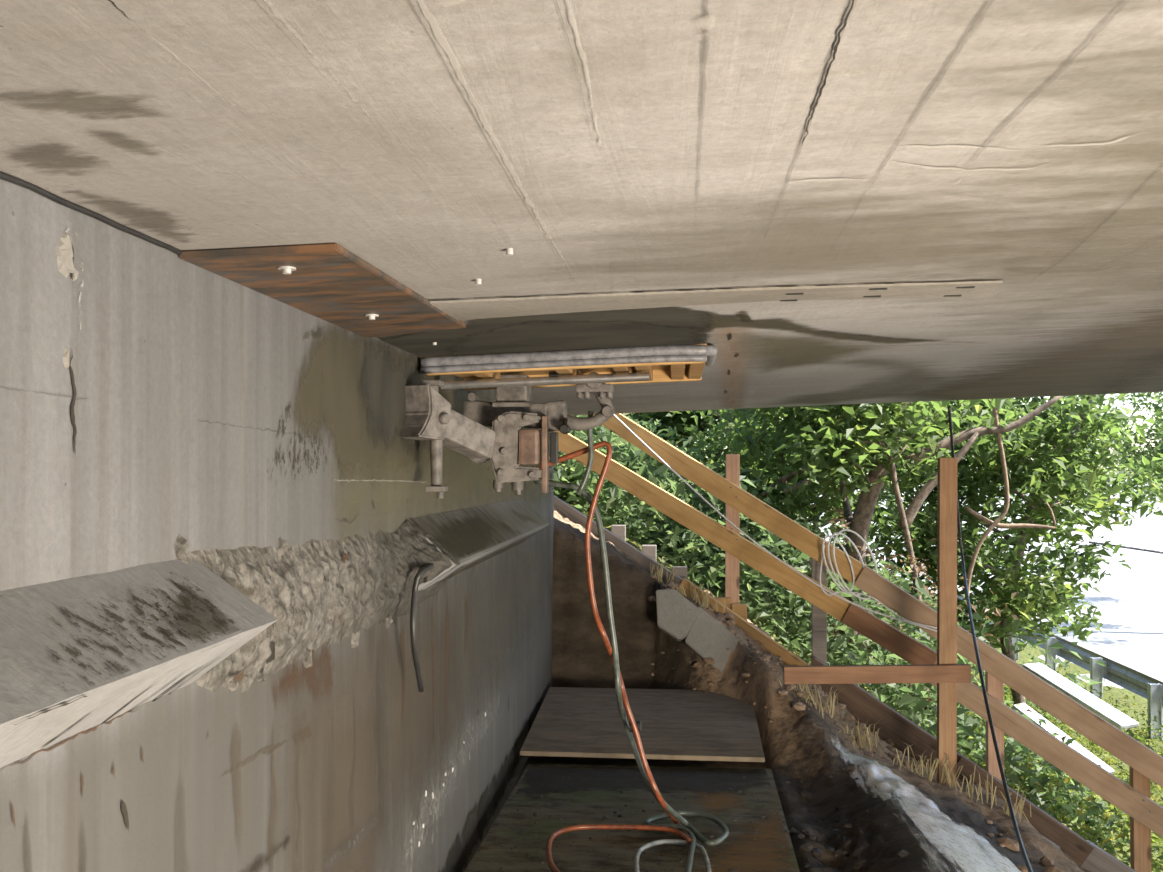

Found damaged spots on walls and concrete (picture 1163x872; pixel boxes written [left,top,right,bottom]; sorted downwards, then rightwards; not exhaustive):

crack [108,0,227,101]
crack [802,0,854,144]
crack [55,231,79,281]
crack [63,347,77,453]
water stain [272,307,929,582]
water stain [53,573,236,684]
spalling [173,517,461,693]